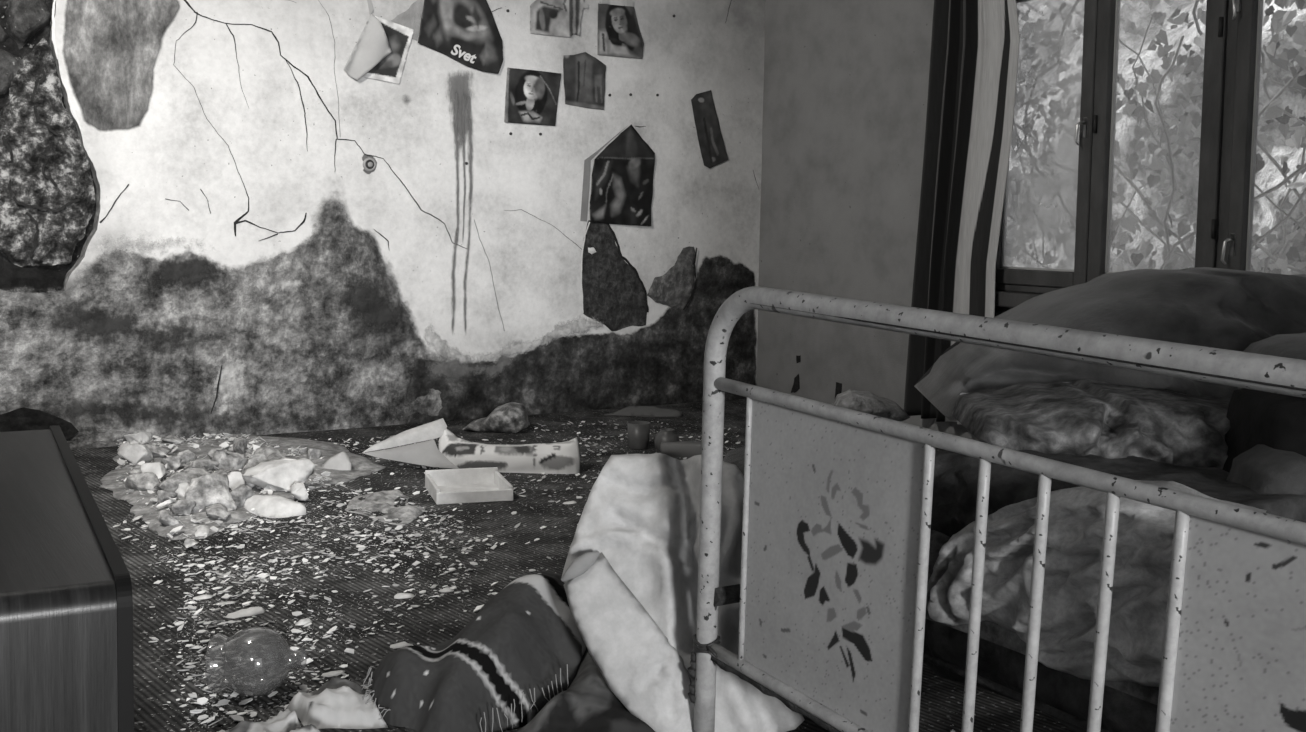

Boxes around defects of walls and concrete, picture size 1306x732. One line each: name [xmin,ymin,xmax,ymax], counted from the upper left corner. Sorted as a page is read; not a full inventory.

flaking render [0,0,180,294]
crack [100,184,129,223]
crack [165,0,505,331]
damp [449,74,473,331]
flaking render [425,220,697,364]